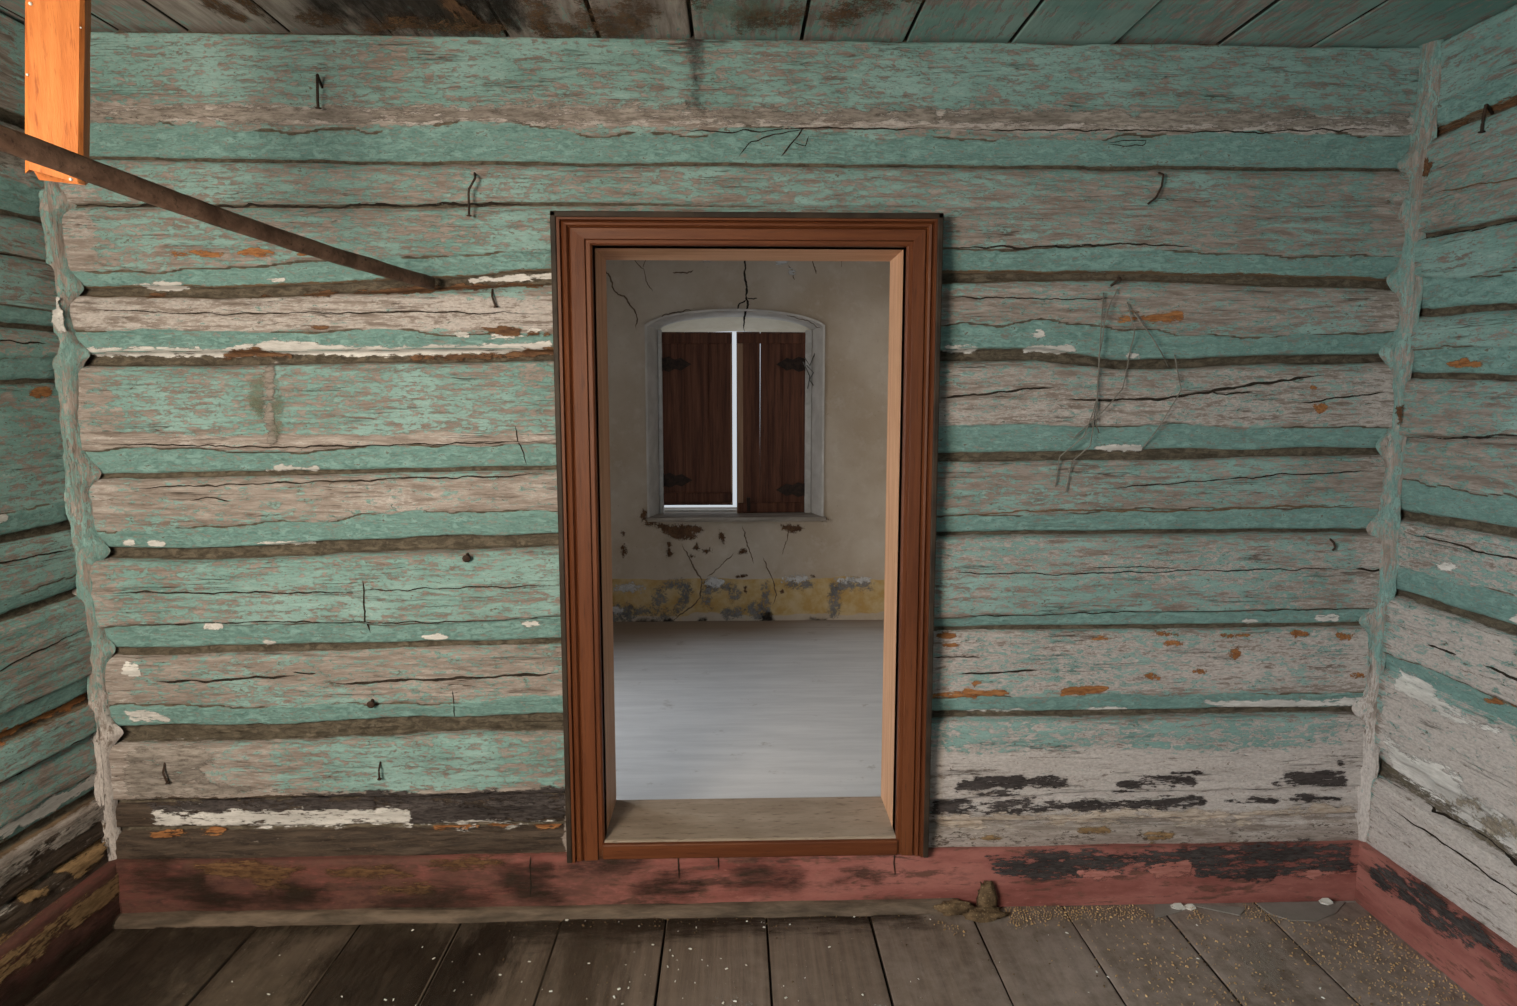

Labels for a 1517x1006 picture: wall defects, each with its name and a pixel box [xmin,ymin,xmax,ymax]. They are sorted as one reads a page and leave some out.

leakage [200,0,275,23]
leakage [292,0,661,38]
leakage [730,0,923,36]
crack [606,260,693,326]
crack [737,261,820,331]
crack [674,527,788,620]
peeling [1204,697,1362,707]
peeling [1394,668,1501,737]
peeling [121,738,566,838]
peeling [1382,730,1517,854]
peeling [0,772,321,1006]
peeling [929,760,1517,978]